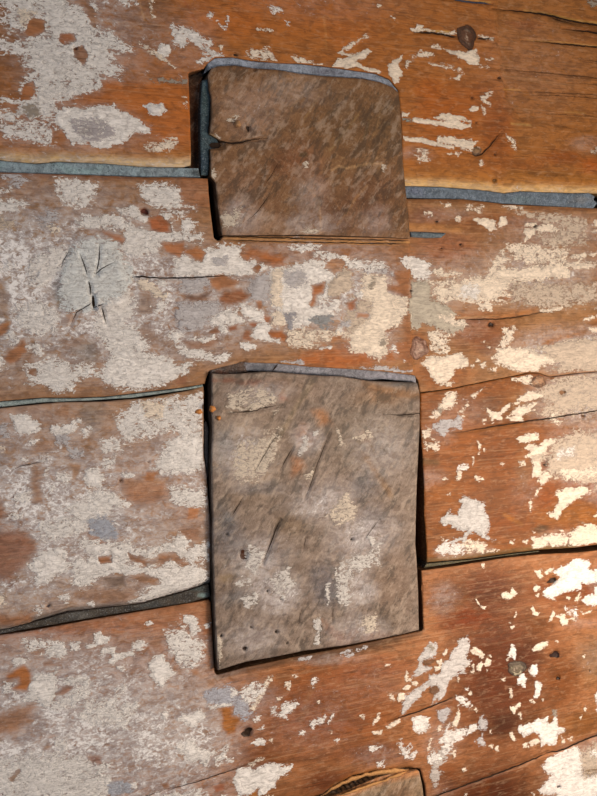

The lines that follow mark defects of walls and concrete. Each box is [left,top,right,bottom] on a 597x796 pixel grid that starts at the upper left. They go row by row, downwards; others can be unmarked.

peeling [0,0,225,153]
peeling [291,33,494,84]
peeling [402,91,493,163]
crack [62,247,112,324]
peeling [531,558,597,626]
peeling [0,732,145,796]
peeling [3,631,148,730]
peeling [147,615,211,688]
peeling [155,675,293,796]
peeling [271,674,299,720]
peeling [359,638,499,788]
peeling [506,644,597,796]